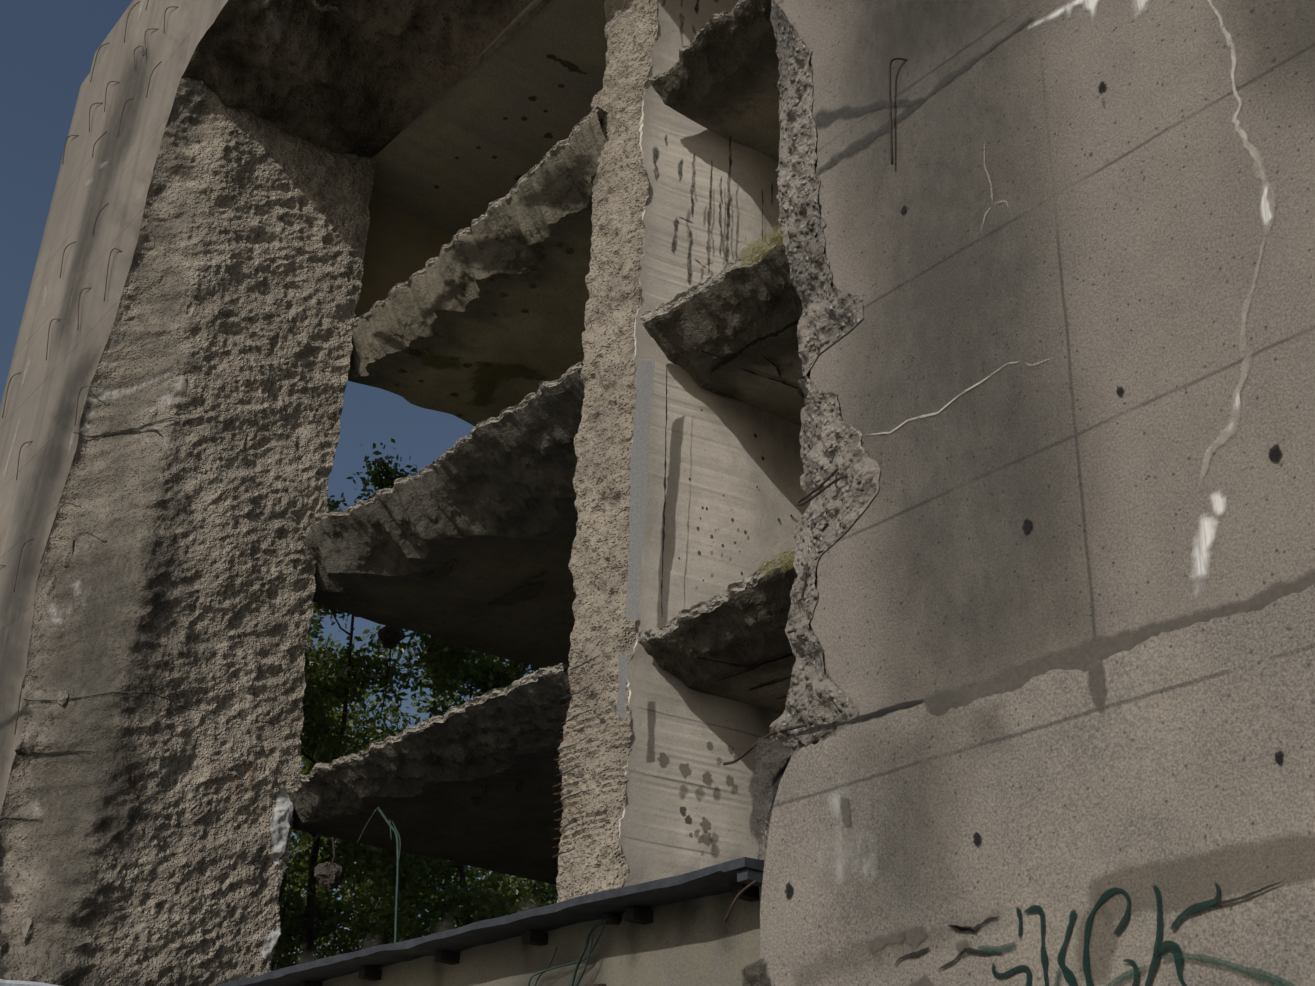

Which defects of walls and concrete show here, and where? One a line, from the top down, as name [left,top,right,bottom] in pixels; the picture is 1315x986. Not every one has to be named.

water stain [1035,0,1098,25]
crack [1207,0,1274,245]
crack [875,362,1037,434]
crack [1202,304,1248,474]
spalling [657,38,880,846]
crack [0,692,292,757]
crack [0,815,42,823]
peeling [270,786,293,865]
peeling [262,928,280,961]